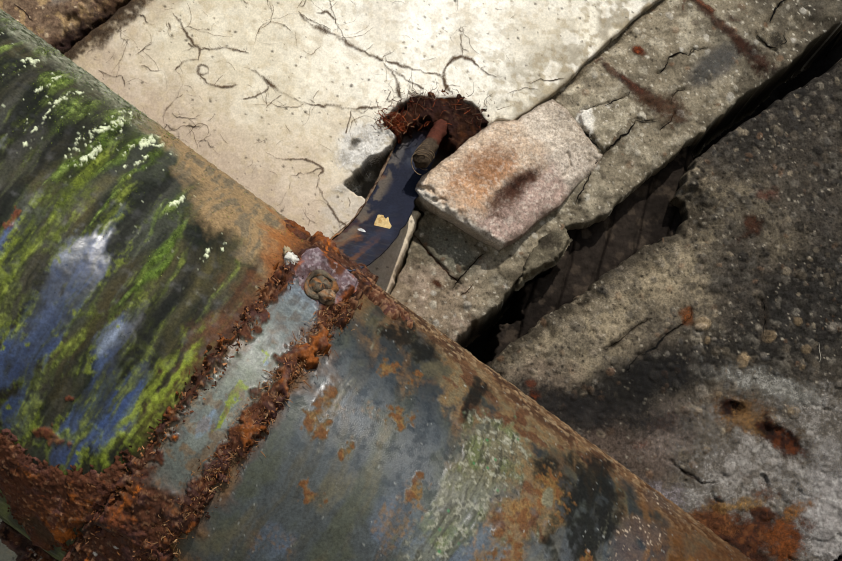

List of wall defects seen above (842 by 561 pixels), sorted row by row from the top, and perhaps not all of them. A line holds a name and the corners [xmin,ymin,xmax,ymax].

crack [127,17,329,108]
crack [295,0,496,133]
peeling [576,97,632,153]
corrosion [595,58,688,128]
corrosion [684,0,775,76]
crack [268,153,346,227]
corrosion [489,170,537,218]
crack [413,234,484,295]
peeling [514,228,573,291]
corrosion [0,251,304,553]
corrosion [715,399,817,464]
corrosion [688,490,813,561]